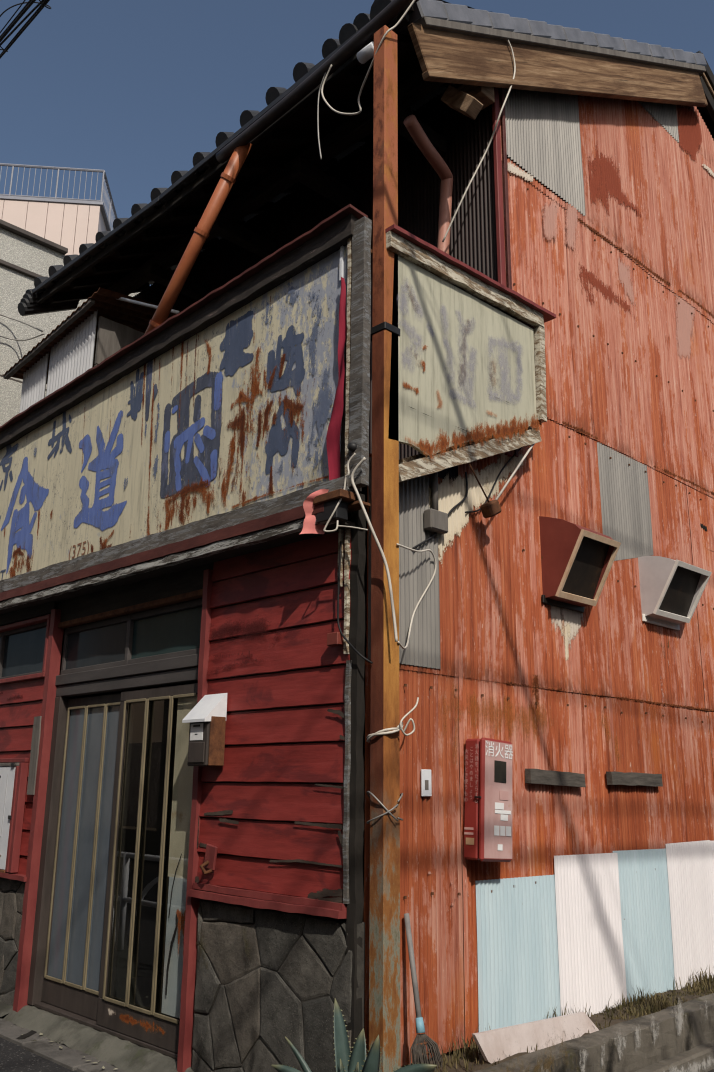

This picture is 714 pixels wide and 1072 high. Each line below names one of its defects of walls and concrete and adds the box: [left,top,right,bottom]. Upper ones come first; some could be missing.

peeling [261,282,333,479]
rust [141,317,329,535]
rust [405,412,541,459]
rust [653,465,714,495]
rust [8,545,34,578]